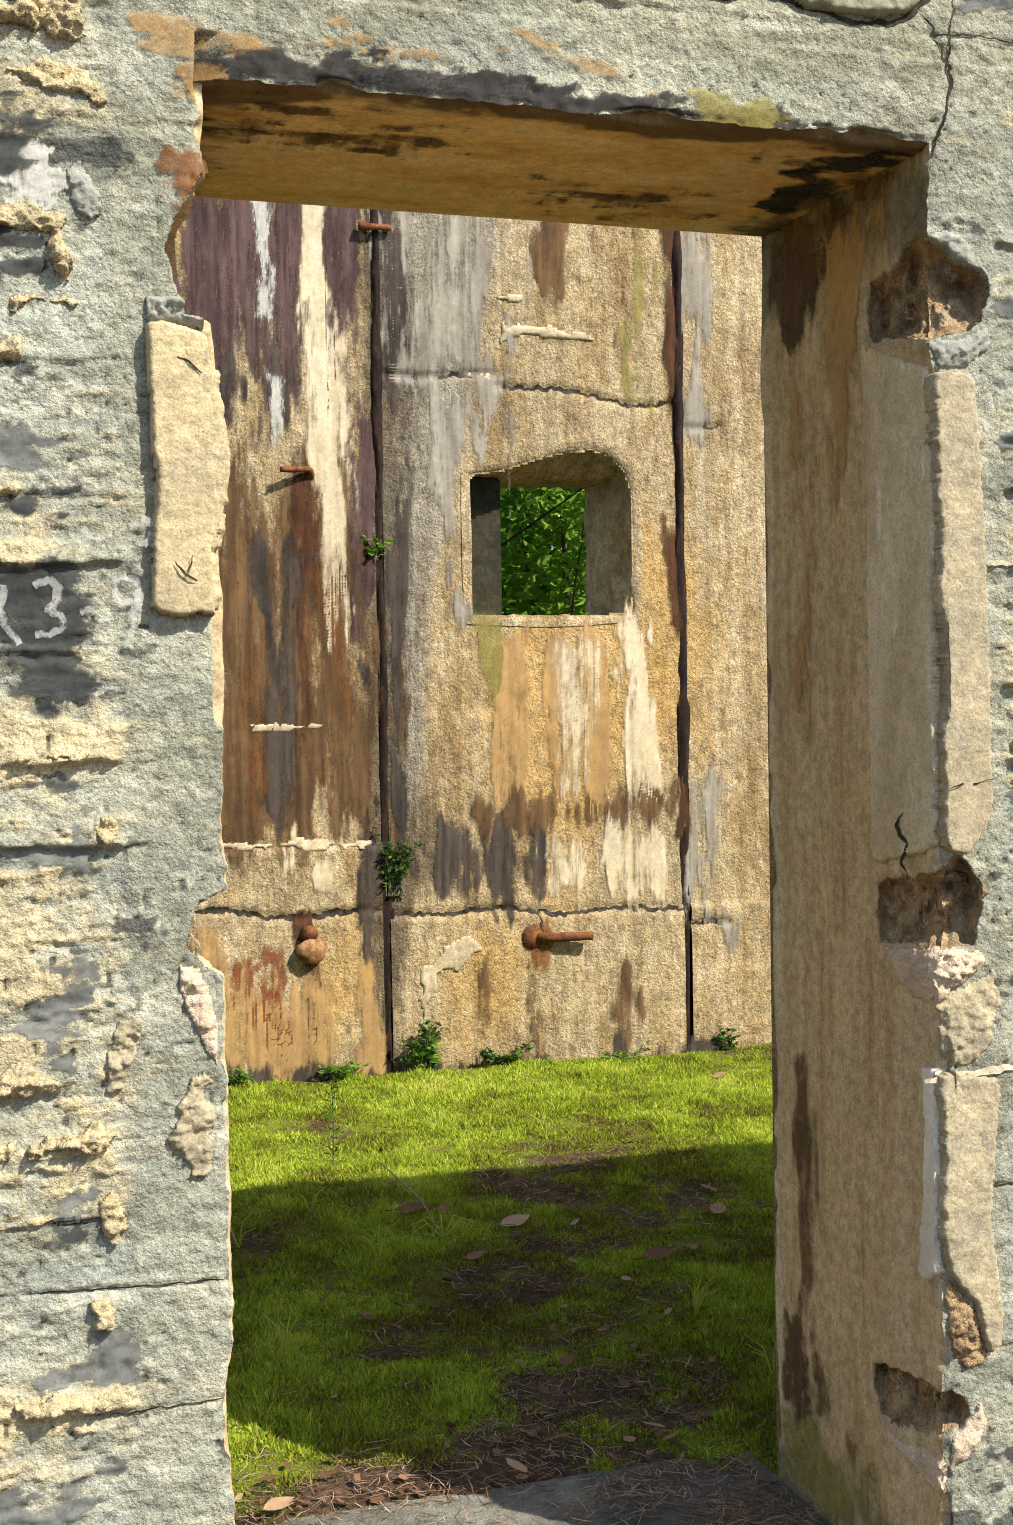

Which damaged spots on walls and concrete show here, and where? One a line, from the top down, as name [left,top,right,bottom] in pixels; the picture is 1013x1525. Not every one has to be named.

crack [783,0,1013,164]
water stain [780,151,905,175]
spalling [867,230,991,369]
crack [386,371,719,431]
water stain [175,197,741,1019]
rust [198,910,386,1081]
crack [195,904,730,932]
water stain [611,952,647,1057]
spalling [877,857,1001,1066]
spalling [944,1279,988,1369]
spalling [874,1363,987,1493]